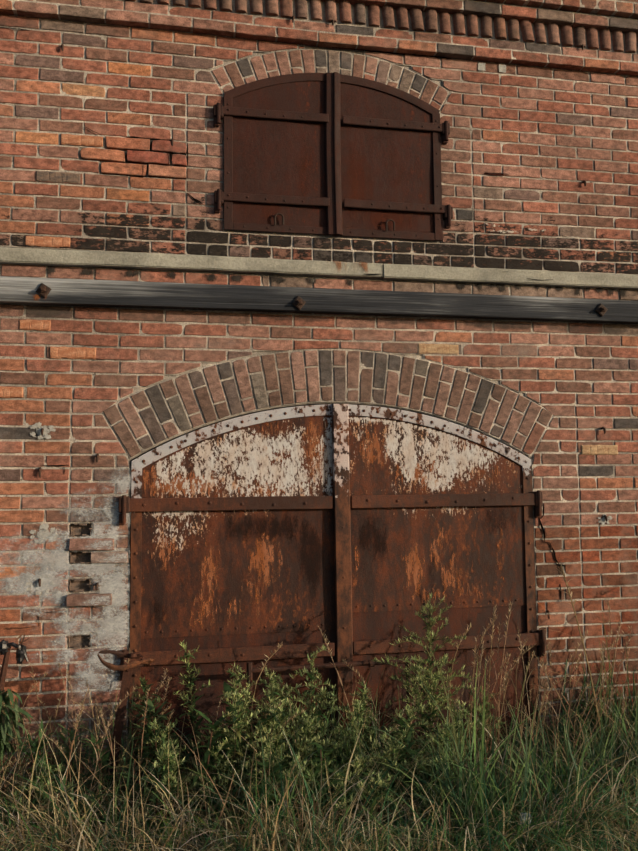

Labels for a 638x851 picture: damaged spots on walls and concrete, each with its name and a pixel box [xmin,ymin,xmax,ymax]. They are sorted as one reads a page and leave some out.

corrosion [143,466,227,497]
peeling [153,417,333,498]
corrosion [360,426,450,493]
peeling [348,417,516,494]
spalling [69,523,92,537]
spalling [70,551,92,564]
spalling [70,578,93,592]
peeling [144,510,272,566]
corrosion [189,542,241,629]
corrosion [227,515,321,615]
corrosion [403,524,480,604]
crack [539,505,565,619]